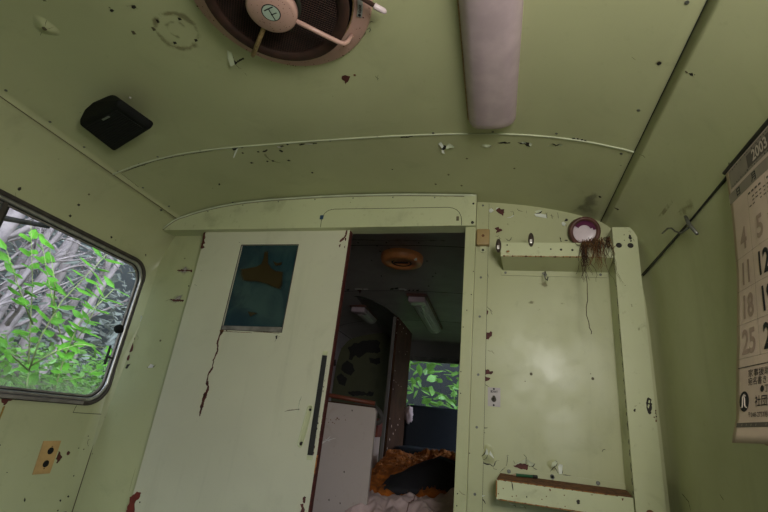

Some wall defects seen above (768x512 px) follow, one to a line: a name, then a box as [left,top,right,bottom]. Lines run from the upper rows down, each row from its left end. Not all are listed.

crack [199,330,227,416]
peeling [501,455,537,471]
peeling [126,475,141,512]